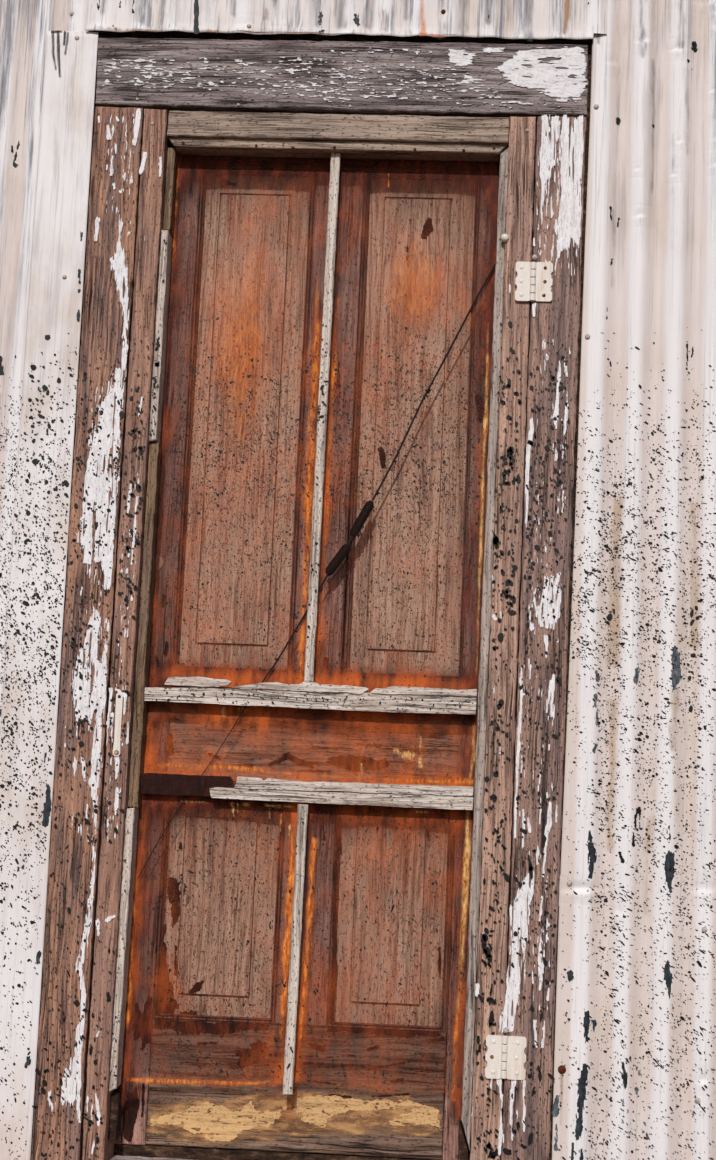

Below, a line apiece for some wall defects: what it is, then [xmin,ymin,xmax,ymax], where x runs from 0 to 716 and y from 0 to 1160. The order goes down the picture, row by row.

peeling [102,46,588,276]
peeling [525,339,571,658]
peeling [48,108,162,1126]
peeling [671,645,682,692]
peeling [499,659,573,1048]
peeling [587,831,597,879]
peeling [664,825,675,893]
peeling [664,960,672,999]
peeling [583,1010,597,1043]
peeling [122,1061,441,1143]
peeling [490,1078,526,1156]
peeling [575,1063,588,1160]